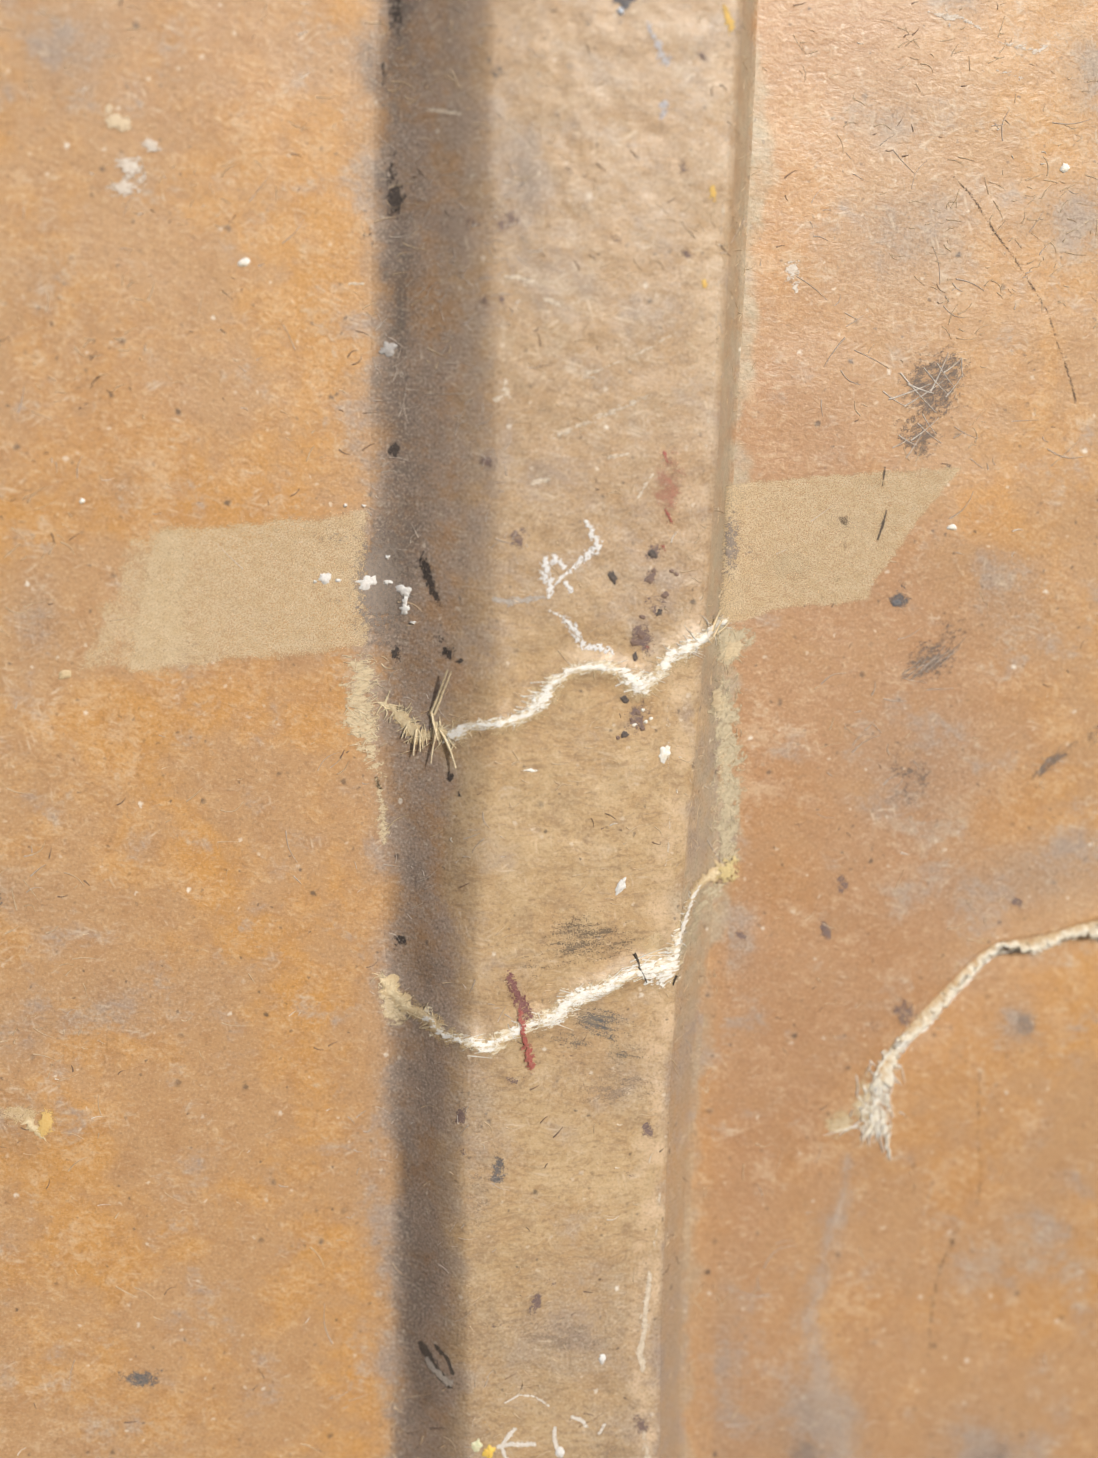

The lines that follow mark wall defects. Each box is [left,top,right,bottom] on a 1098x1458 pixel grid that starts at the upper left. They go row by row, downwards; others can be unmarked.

crack [371,610,730,768]
crack [371,854,740,1068]
crack [819,907,1098,1160]